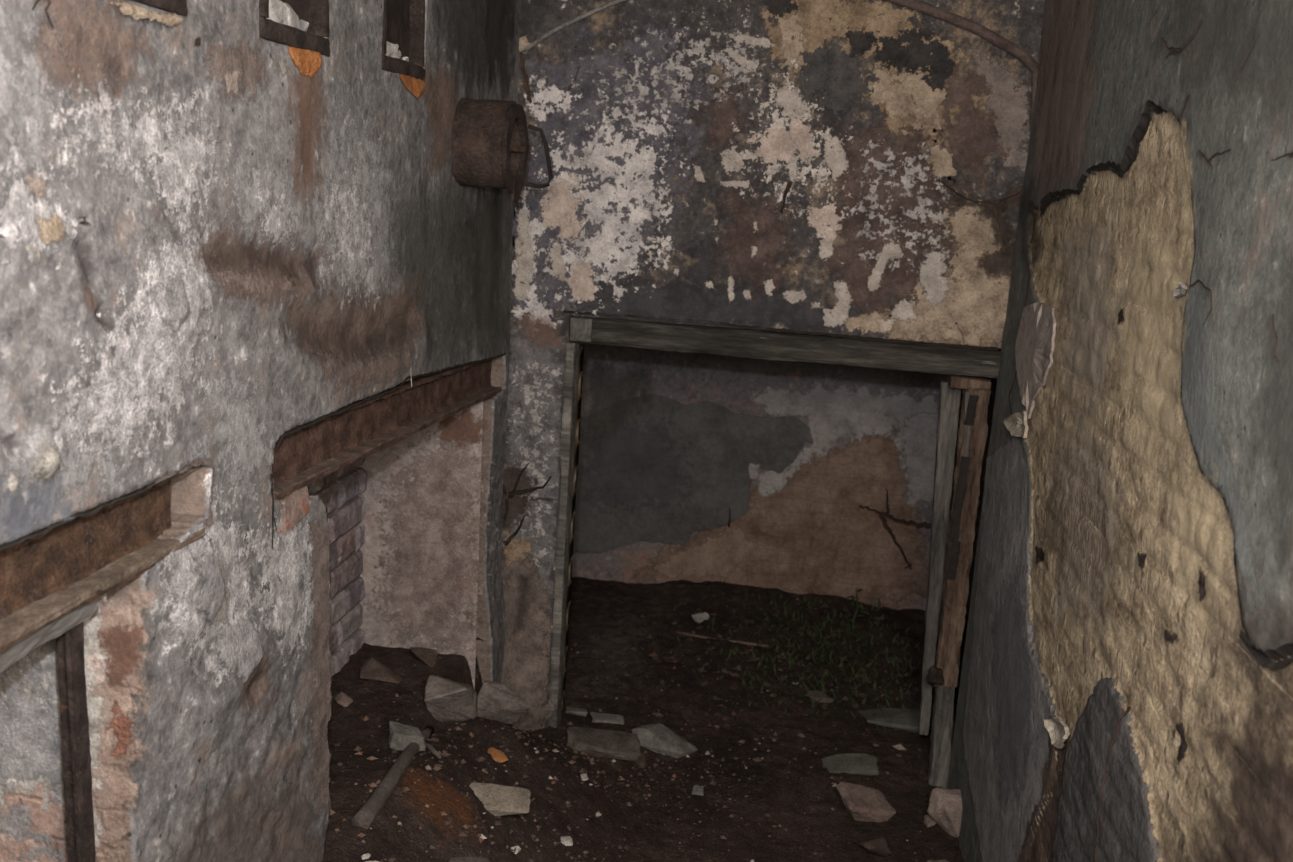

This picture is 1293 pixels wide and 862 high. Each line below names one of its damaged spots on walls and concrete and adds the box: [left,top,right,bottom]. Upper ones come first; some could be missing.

spalling [91,587,155,862]
leakage [0,0,513,690]
spalling [364,0,1293,862]
crack [859,489,931,569]